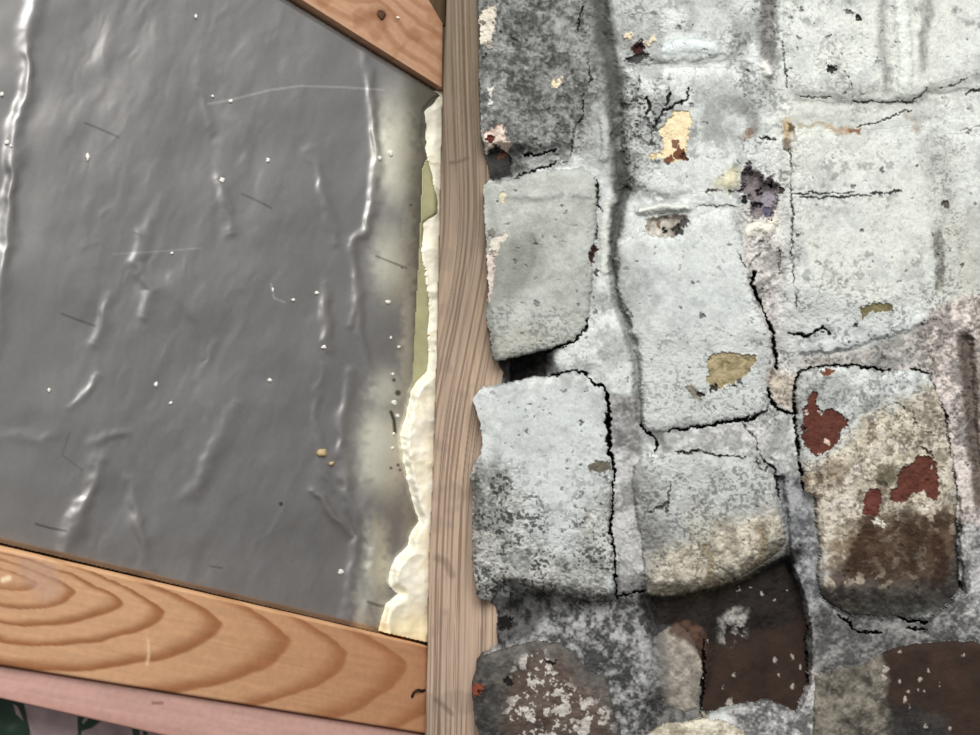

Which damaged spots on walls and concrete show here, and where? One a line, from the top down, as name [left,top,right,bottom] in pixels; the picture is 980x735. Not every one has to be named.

crack [639,79,690,128]
peeling [649,110,693,164]
spalling [737,161,785,219]
spalling [645,214,690,238]
crack [640,136,887,500]
peeling [854,301,893,327]
peeling [685,352,756,401]
crack [896,368,957,490]
crack [546,320,647,598]
leakage [845,510,949,586]
crack [838,615,881,634]
crack [898,616,928,631]